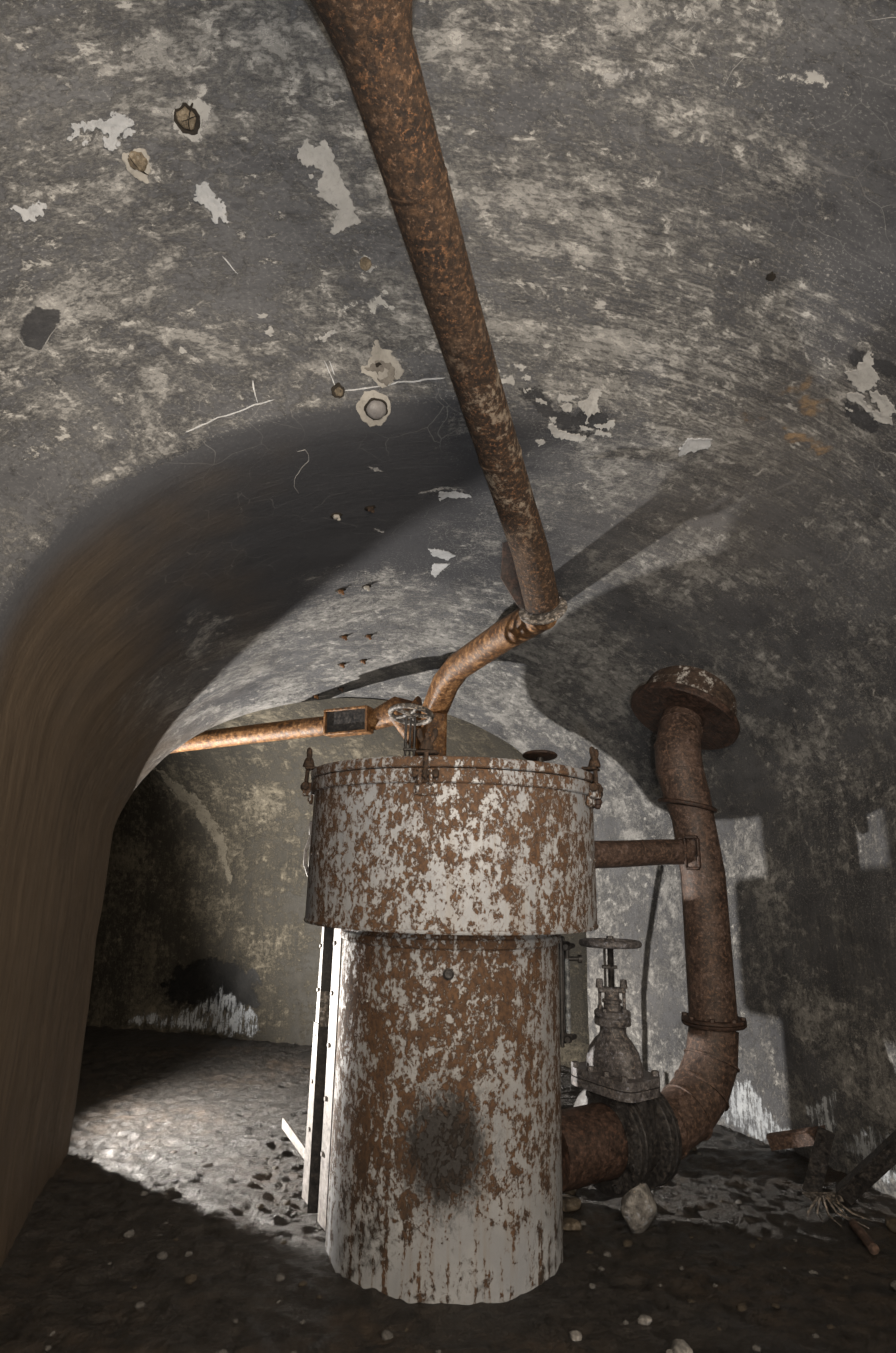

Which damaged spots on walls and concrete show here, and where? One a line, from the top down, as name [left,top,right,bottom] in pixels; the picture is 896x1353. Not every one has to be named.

peeling [67,111,136,151]
peeling [193,181,229,227]
peeling [293,138,361,235]
peeling [21,307,60,350]
spalling [361,340,404,388]
peeling [498,364,616,447]
peeling [844,349,896,433]
peeling [428,548,456,577]